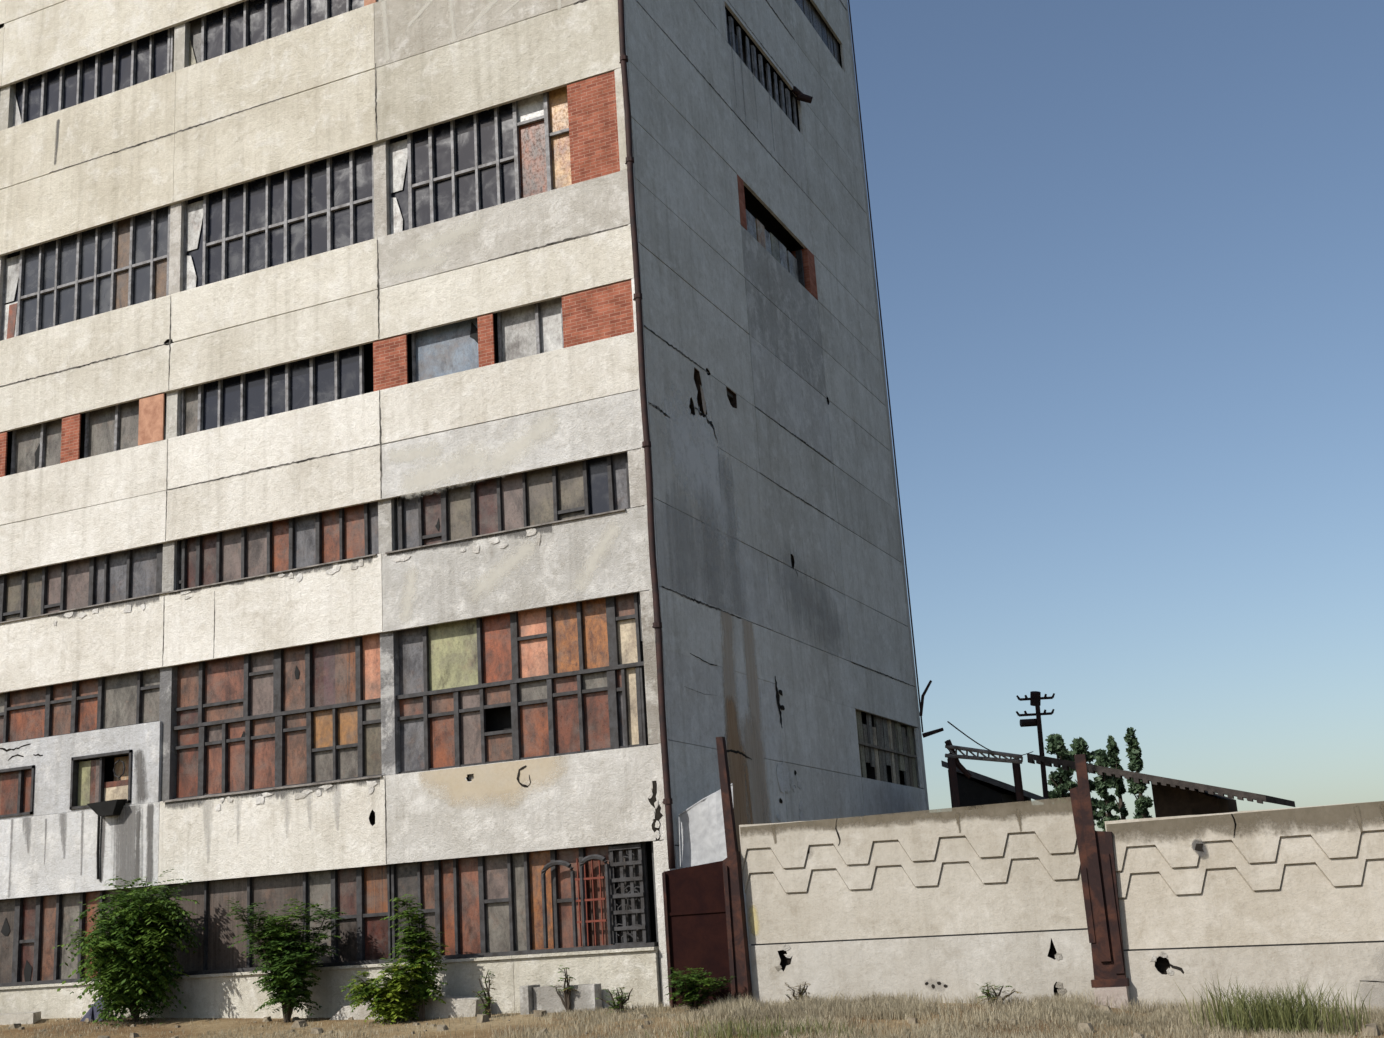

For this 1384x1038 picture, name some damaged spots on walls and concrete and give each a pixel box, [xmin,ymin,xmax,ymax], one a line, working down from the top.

spalling [689,368,719,451]
corrosion [721,611,769,876]
leakage [9,751,154,888]
spalling [775,944,793,971]
spalling [1048,938,1063,961]
hole [1151,951,1184,975]